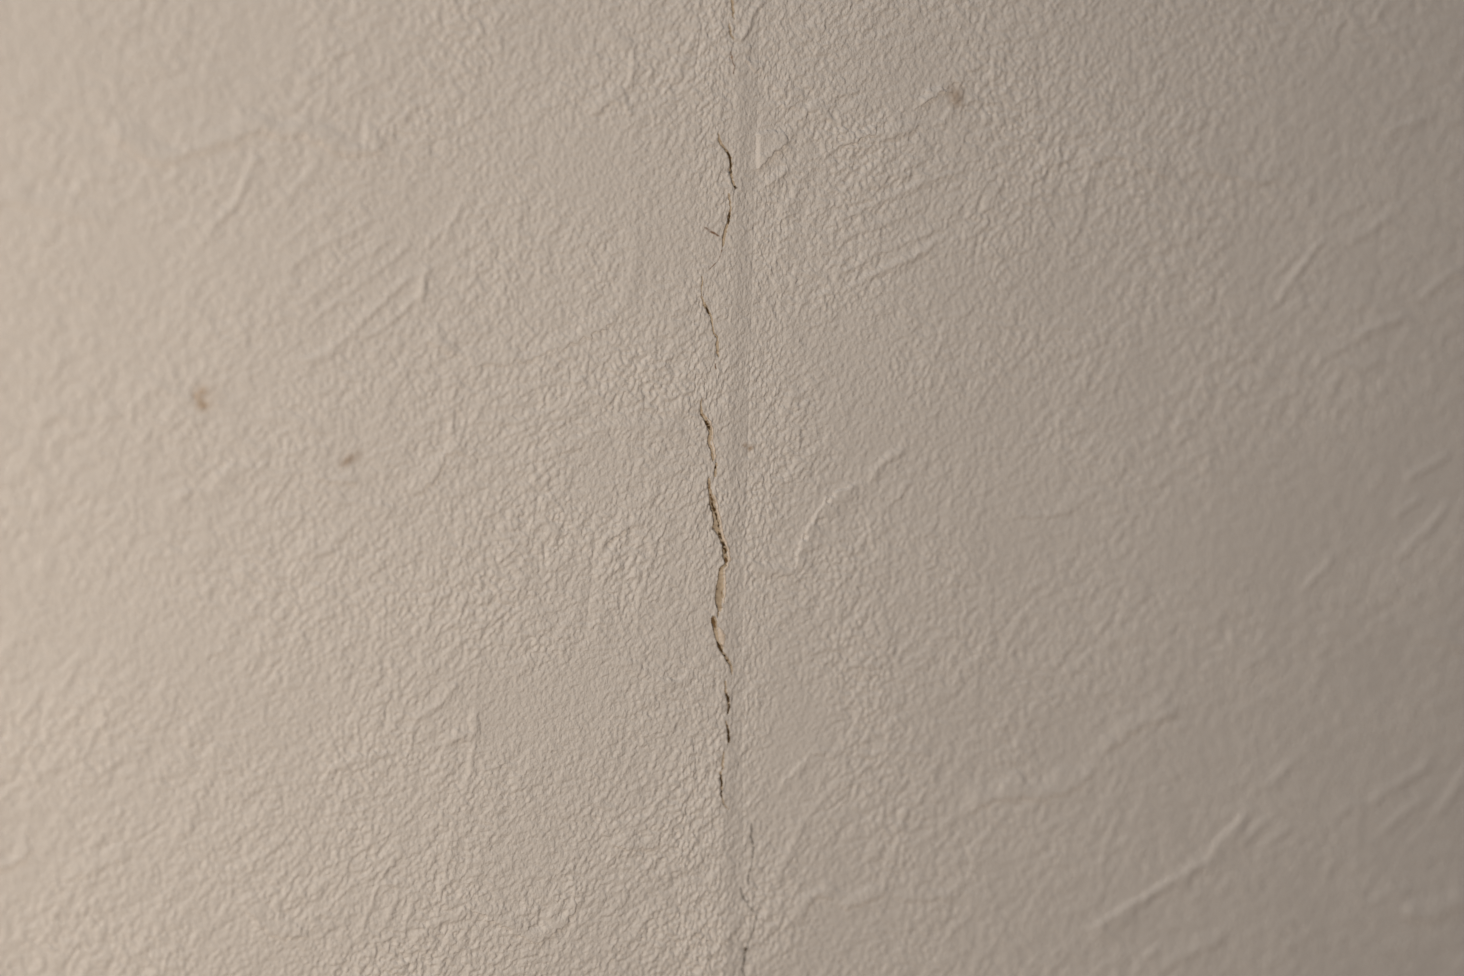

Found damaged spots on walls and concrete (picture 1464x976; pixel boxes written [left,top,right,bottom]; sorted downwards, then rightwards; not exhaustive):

crack [727,0,735,74]
crack [700,134,757,973]